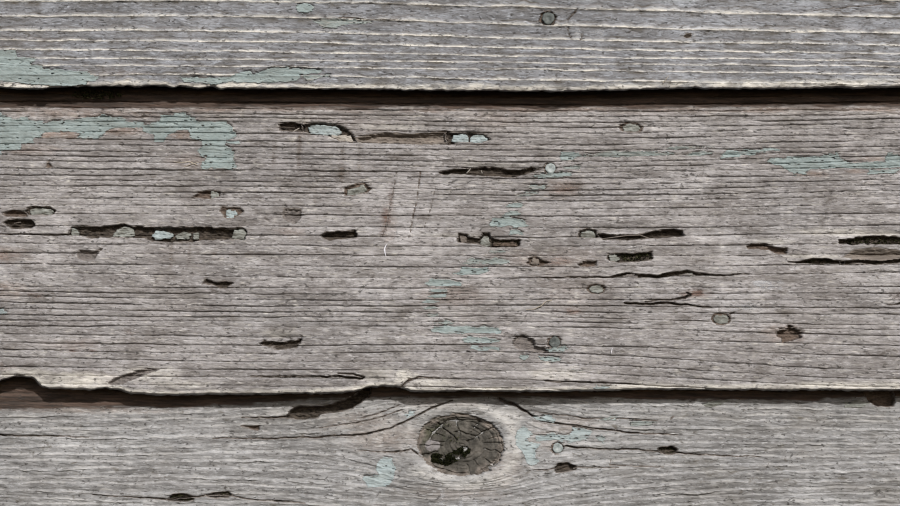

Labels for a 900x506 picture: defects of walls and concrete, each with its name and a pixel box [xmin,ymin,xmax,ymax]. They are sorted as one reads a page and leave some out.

peeling [0,49,98,86]
peeling [0,112,240,171]
crack [438,166,542,178]
crack [577,228,685,241]
crack [838,235,900,246]
crack [746,243,788,255]
crack [542,270,749,316]